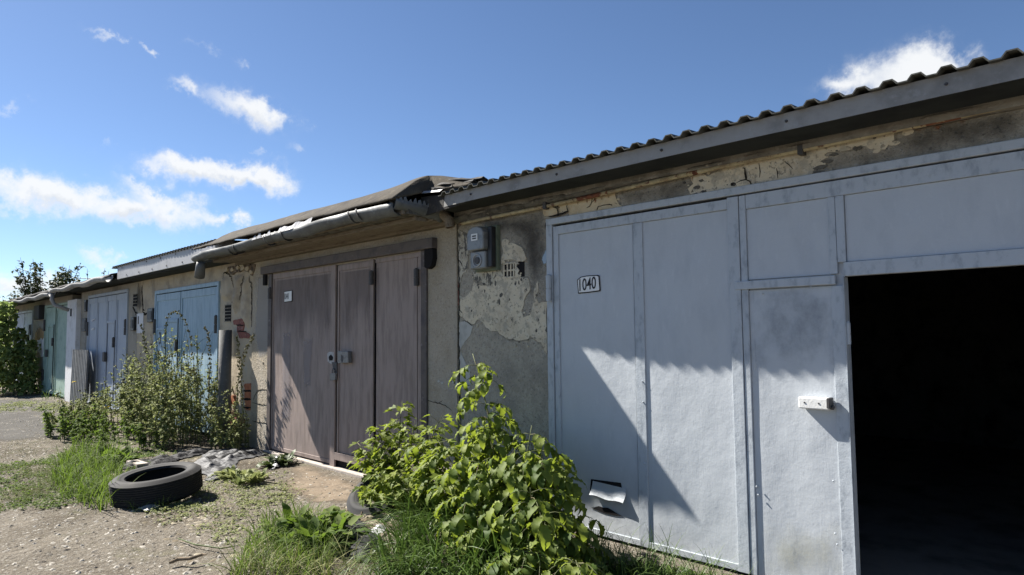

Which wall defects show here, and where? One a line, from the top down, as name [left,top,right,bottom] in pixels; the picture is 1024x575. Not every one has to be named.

peeling [683,130,914,194]
water stain [513,222,540,269]
crack [223,272,252,327]
flaking render [233,319,250,339]
peeling [458,229,548,389]